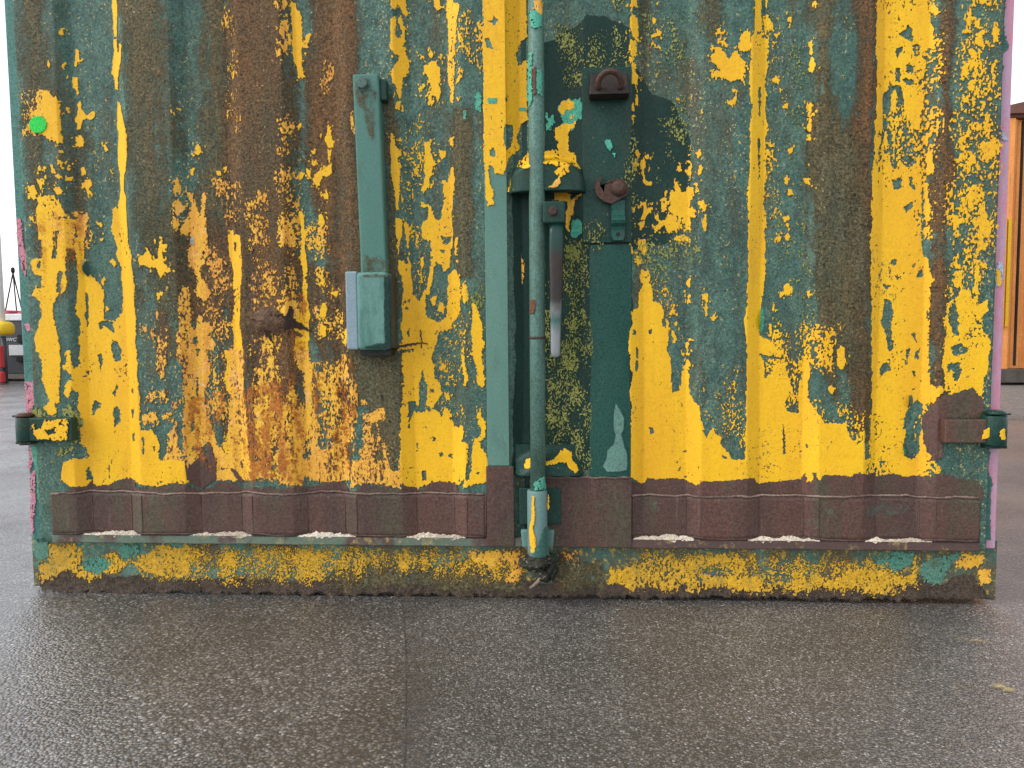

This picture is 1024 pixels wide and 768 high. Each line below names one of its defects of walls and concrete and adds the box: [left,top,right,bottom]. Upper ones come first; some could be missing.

rust [117,0,406,489]
rust [448,106,477,279]
peeling [16,0,1009,588]
rust [805,0,879,442]
rust [921,0,985,462]
peeling [607,548,992,599]